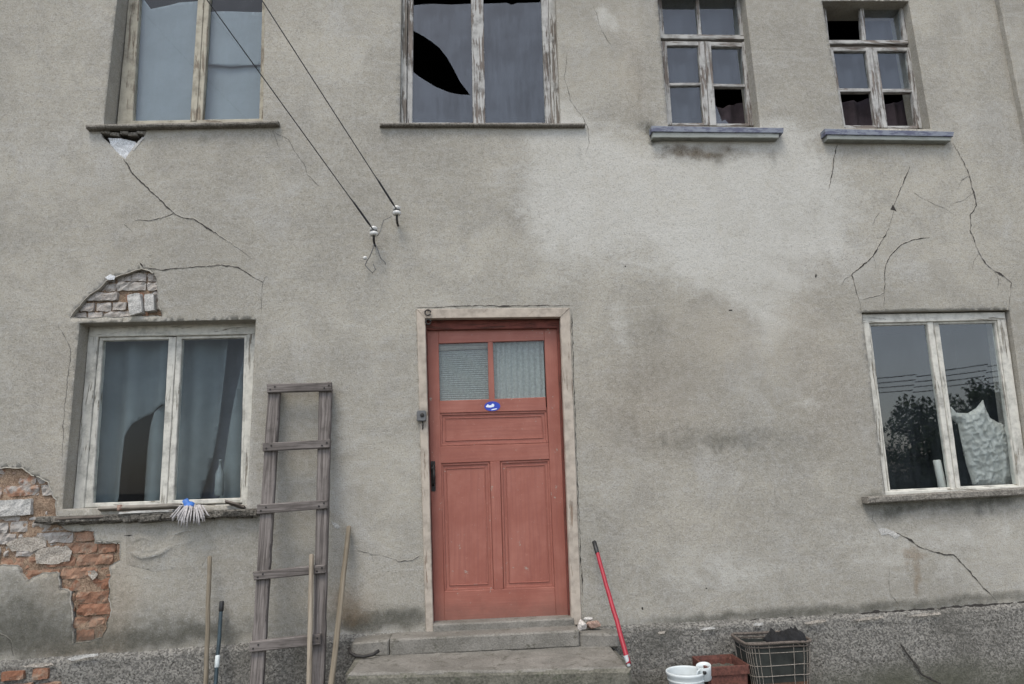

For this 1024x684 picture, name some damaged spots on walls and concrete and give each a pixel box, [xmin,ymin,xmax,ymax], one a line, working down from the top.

spalling [101,130,146,158]
crack [829,145,838,189]
crack [123,159,266,314]
crack [843,143,1012,311]
spalling [70,268,162,319]
spalling [0,467,253,661]
crack [833,517,1024,615]